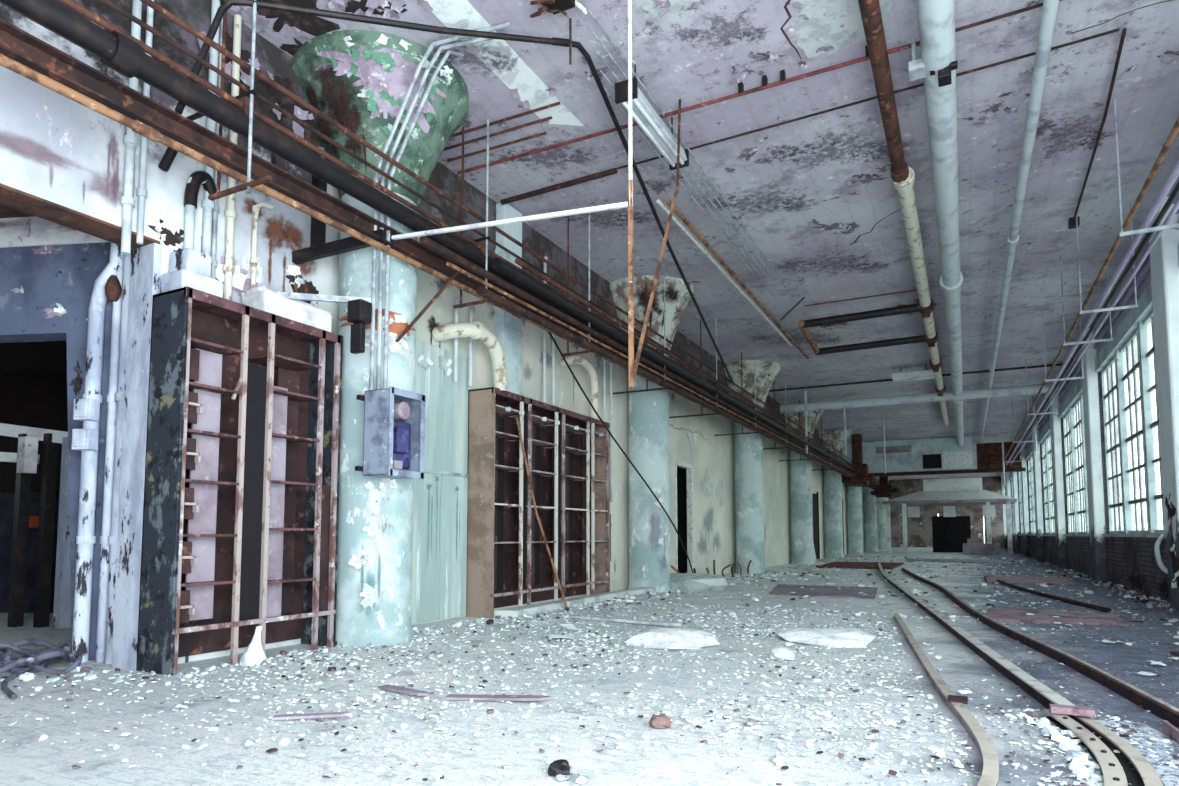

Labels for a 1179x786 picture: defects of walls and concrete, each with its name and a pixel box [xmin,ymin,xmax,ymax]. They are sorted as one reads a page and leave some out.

peeling [220,0,618,158]
corrosion [245,199,314,303]
peeling [42,303,67,318]
peeling [69,360,83,395]